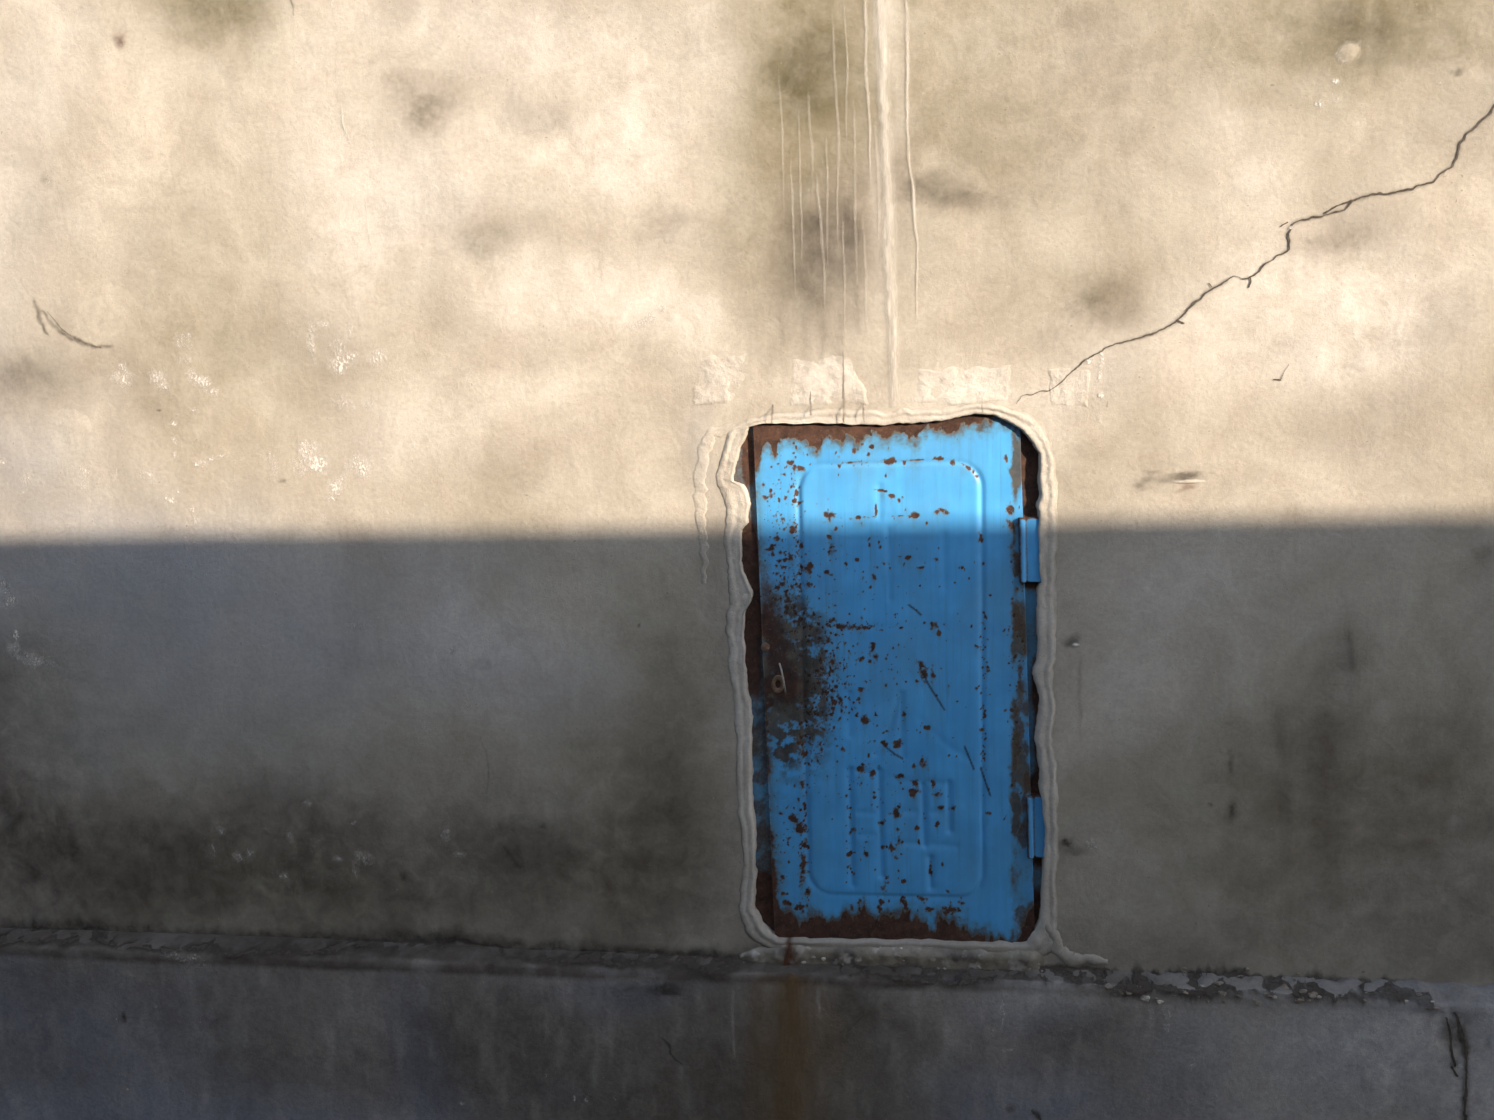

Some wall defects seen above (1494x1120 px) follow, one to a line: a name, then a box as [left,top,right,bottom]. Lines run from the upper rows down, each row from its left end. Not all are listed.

damp [877,0,898,408]
crack [1016,106,1494,404]
spalling [1103,964,1439,1011]
crack [1445,1012,1468,1120]